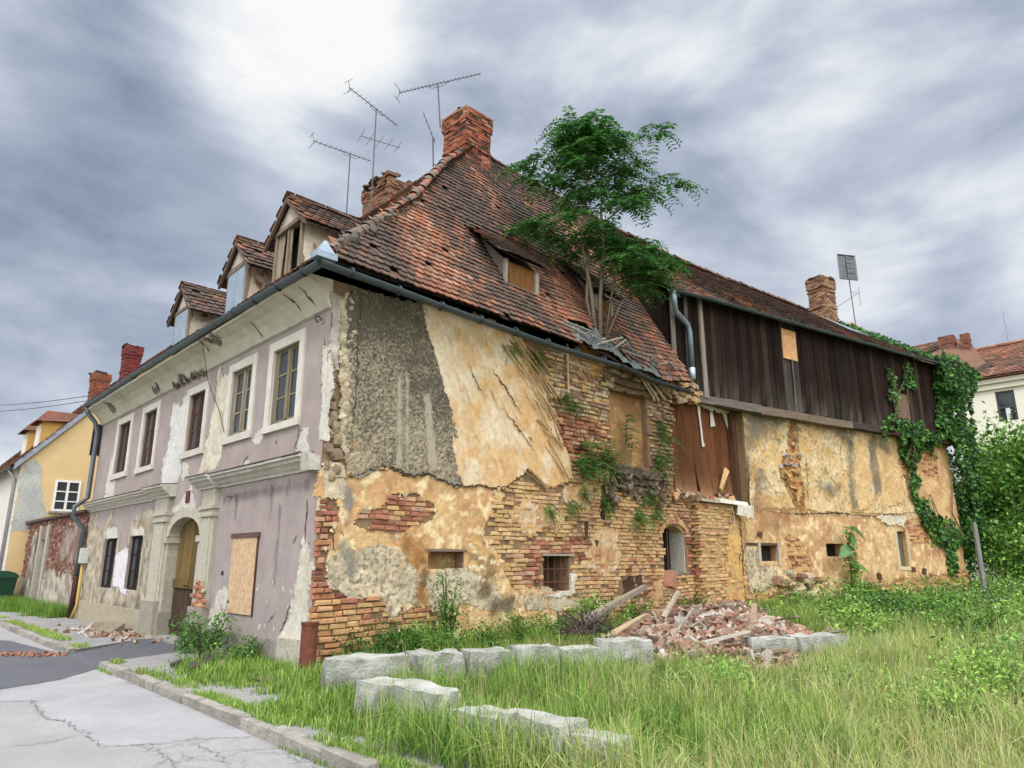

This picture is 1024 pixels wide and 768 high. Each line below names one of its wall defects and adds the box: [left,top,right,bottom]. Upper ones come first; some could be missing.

peeling [11,459,47,533]
peeling [79,457,154,610]
peeling [160,365,229,514]
spalling [258,492,439,664]
crack [338,303,550,491]
spalling [483,347,696,622]
spalling [778,421,807,515]
crack [739,455,909,601]